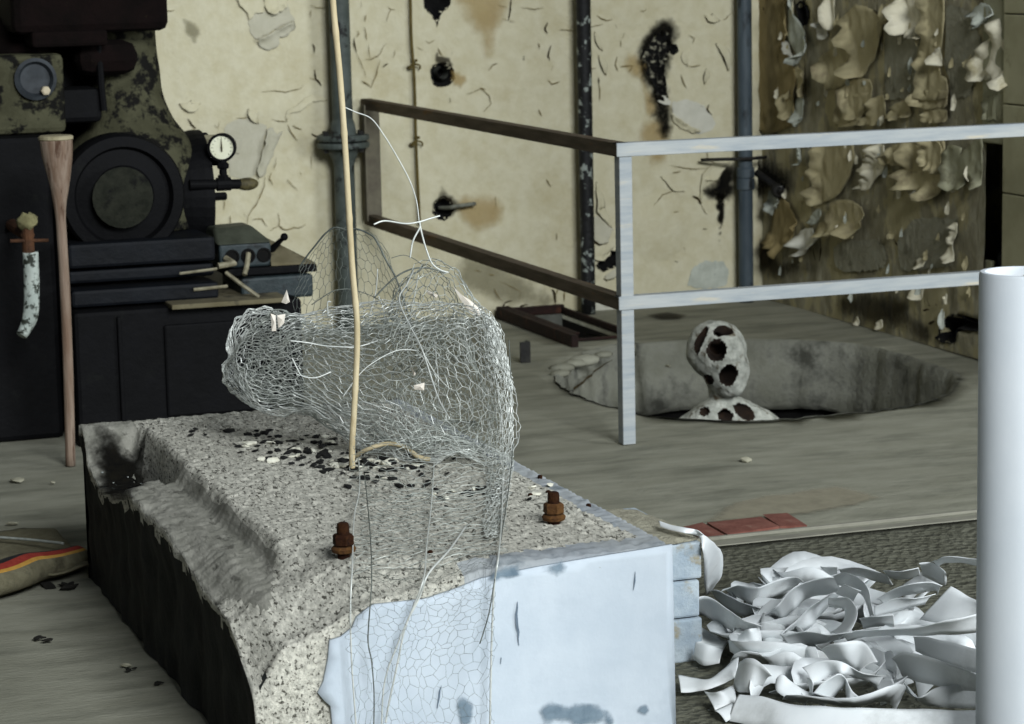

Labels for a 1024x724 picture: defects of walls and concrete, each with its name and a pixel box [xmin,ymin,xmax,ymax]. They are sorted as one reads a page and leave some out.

flaking render [238,0,296,50]
peeling [758,0,1009,134]
flaking render [224,118,283,178]
crack [224,45,327,230]
peeling [760,139,983,260]
flaking render [898,217,958,272]
peeling [907,289,924,301]
spalling [934,314,978,343]
spalling [257,434,423,479]